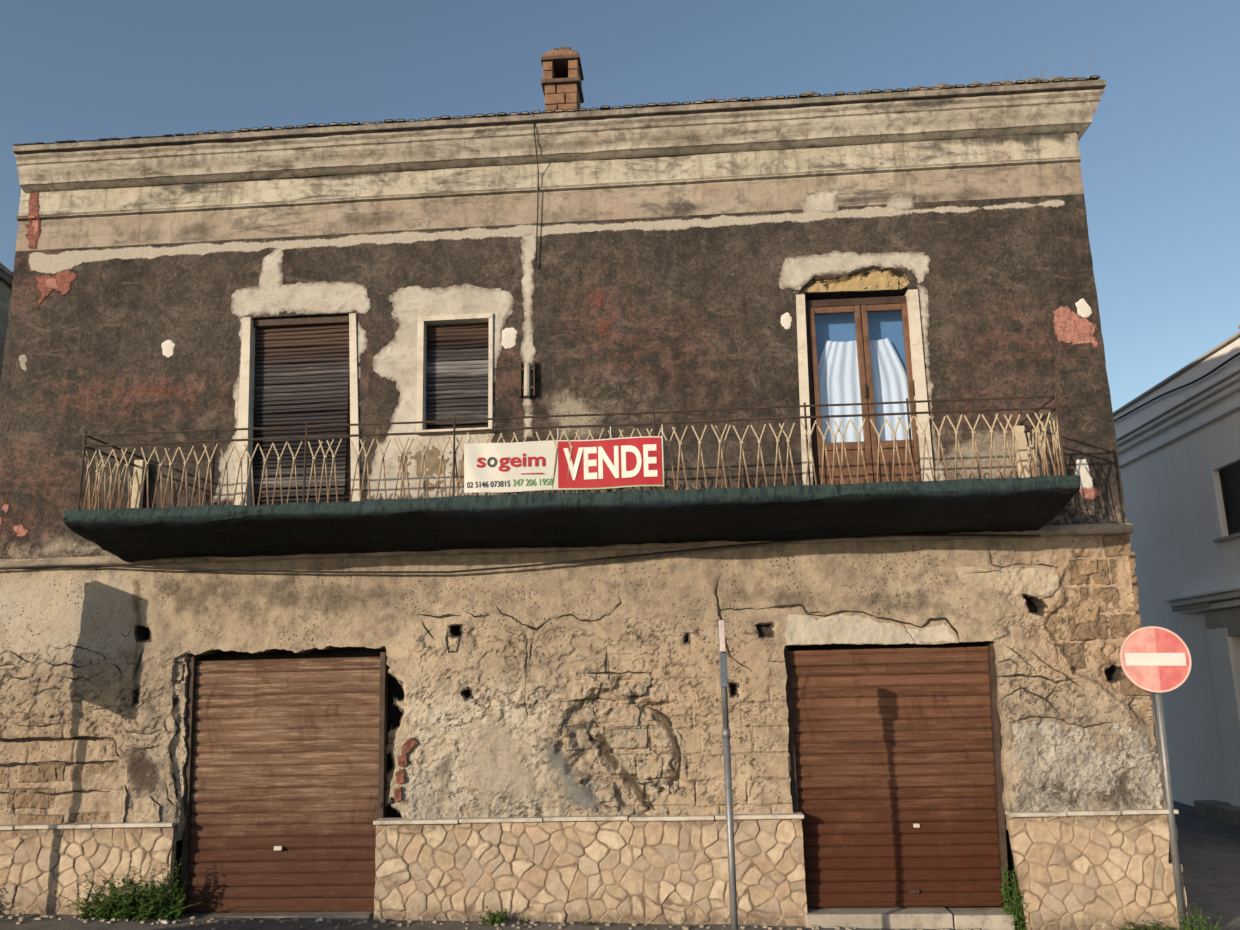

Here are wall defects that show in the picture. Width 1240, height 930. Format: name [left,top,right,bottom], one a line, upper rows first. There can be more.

peeling [25,192,42,249]
peeling [34,269,77,310]
spalling [801,269,909,294]
peeling [1053,306,1099,349]
crack [974,545,1061,599]
crack [0,629,190,820]
spalling [386,674,419,818]
crack [416,597,621,720]
crack [563,652,681,810]
crack [715,576,959,671]
crack [994,632,1110,733]